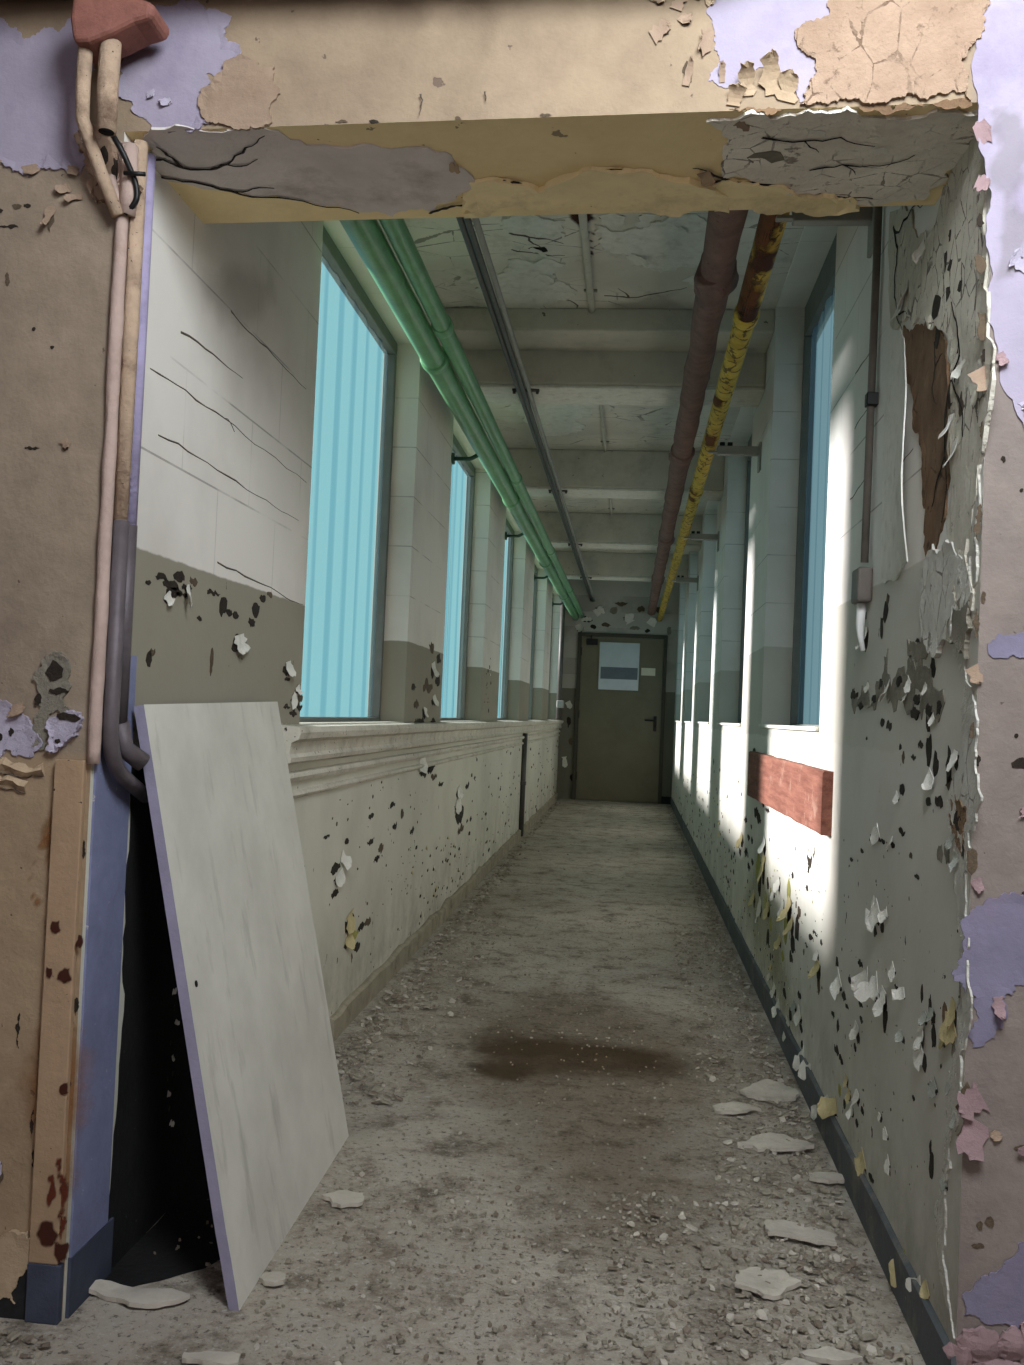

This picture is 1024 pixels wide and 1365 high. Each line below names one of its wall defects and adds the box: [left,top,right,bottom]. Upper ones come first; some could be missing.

peeling [0,18,118,232]
crack [156,136,358,213]
crack [693,137,915,199]
crack [893,205,923,329]
peeling [145,571,272,660]
spalling [283,660,303,717]
peeling [411,642,441,723]
peeling [1011,757,1024,768]
peeling [324,700,572,968]
peeling [680,774,905,1127]
peeling [737,1132,815,1152]
peeling [888,1248,930,1299]